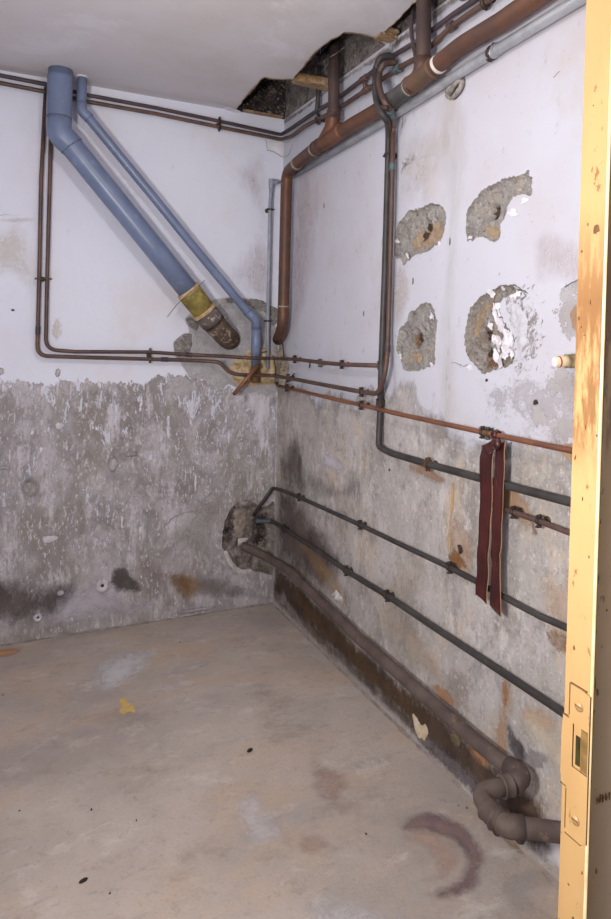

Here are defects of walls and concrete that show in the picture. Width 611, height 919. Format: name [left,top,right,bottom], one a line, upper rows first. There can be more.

flaking render [394,203,446,266]
flaking render [466,170,533,242]
flaking render [396,302,438,372]
flaking render [464,272,545,381]
peeling [552,279,585,342]
water stain [0,568,140,619]
peeling [0,367,576,821]
water stain [274,495,503,793]
water stain [547,587,568,652]
water stain [507,719,561,767]
water stain [495,791,541,818]
water stain [529,840,560,868]